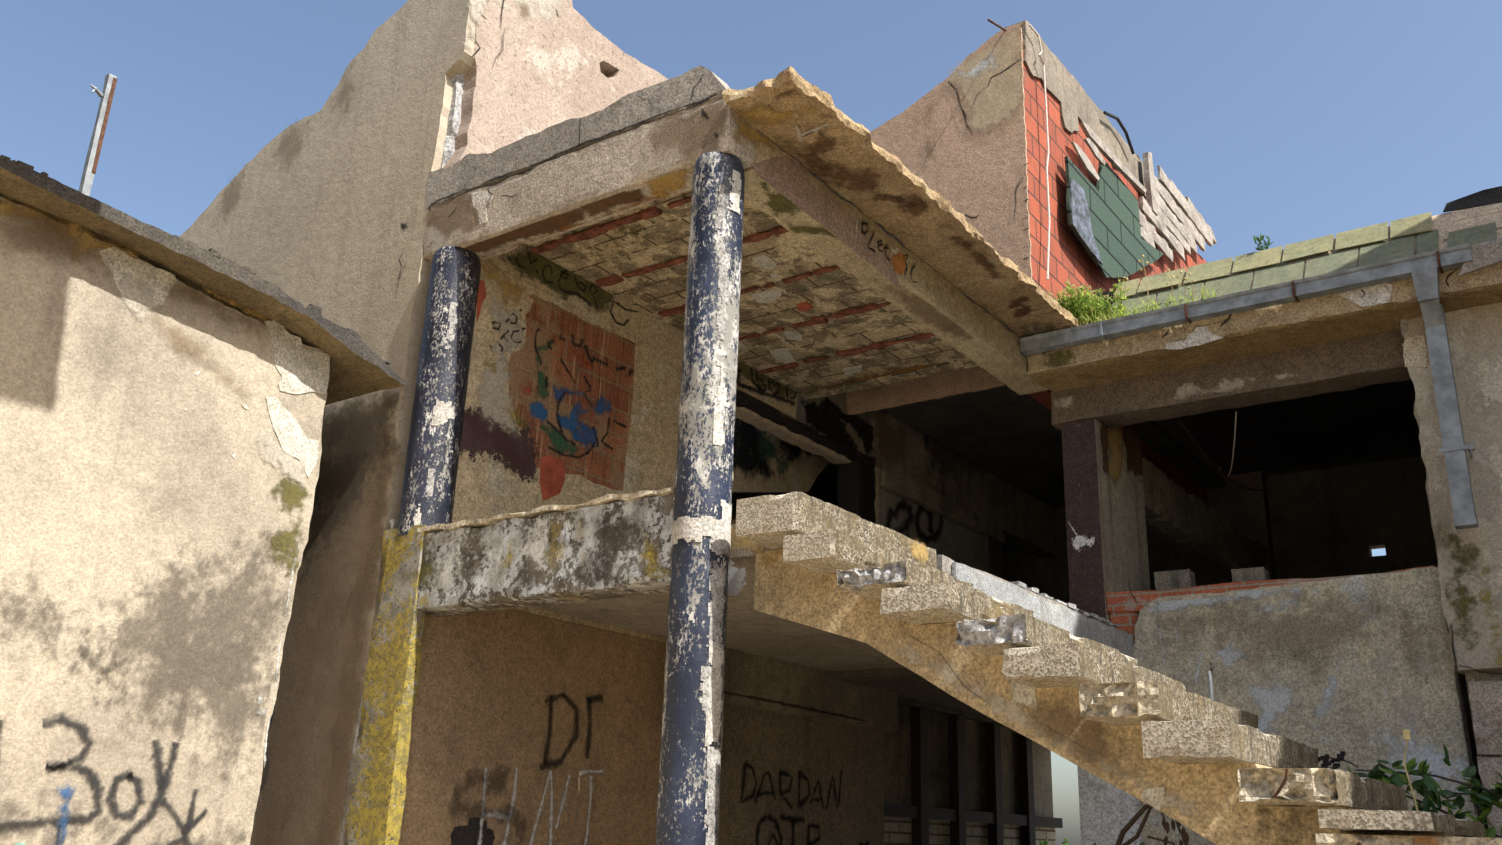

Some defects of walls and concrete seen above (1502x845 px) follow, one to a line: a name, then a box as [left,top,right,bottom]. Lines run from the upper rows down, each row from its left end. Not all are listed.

crack [493,0,506,66]
crack [948,59,1020,135]
water stain [734,89,928,216]
water stain [761,182,858,242]
peeling [100,247,177,320]
water stain [892,288,965,337]
water stain [949,225,998,278]
water stain [1009,297,1039,318]
peeling [257,321,330,483]
spalling [432,280,636,500]
water stain [256,395,400,845]
peeling [671,499,746,845]